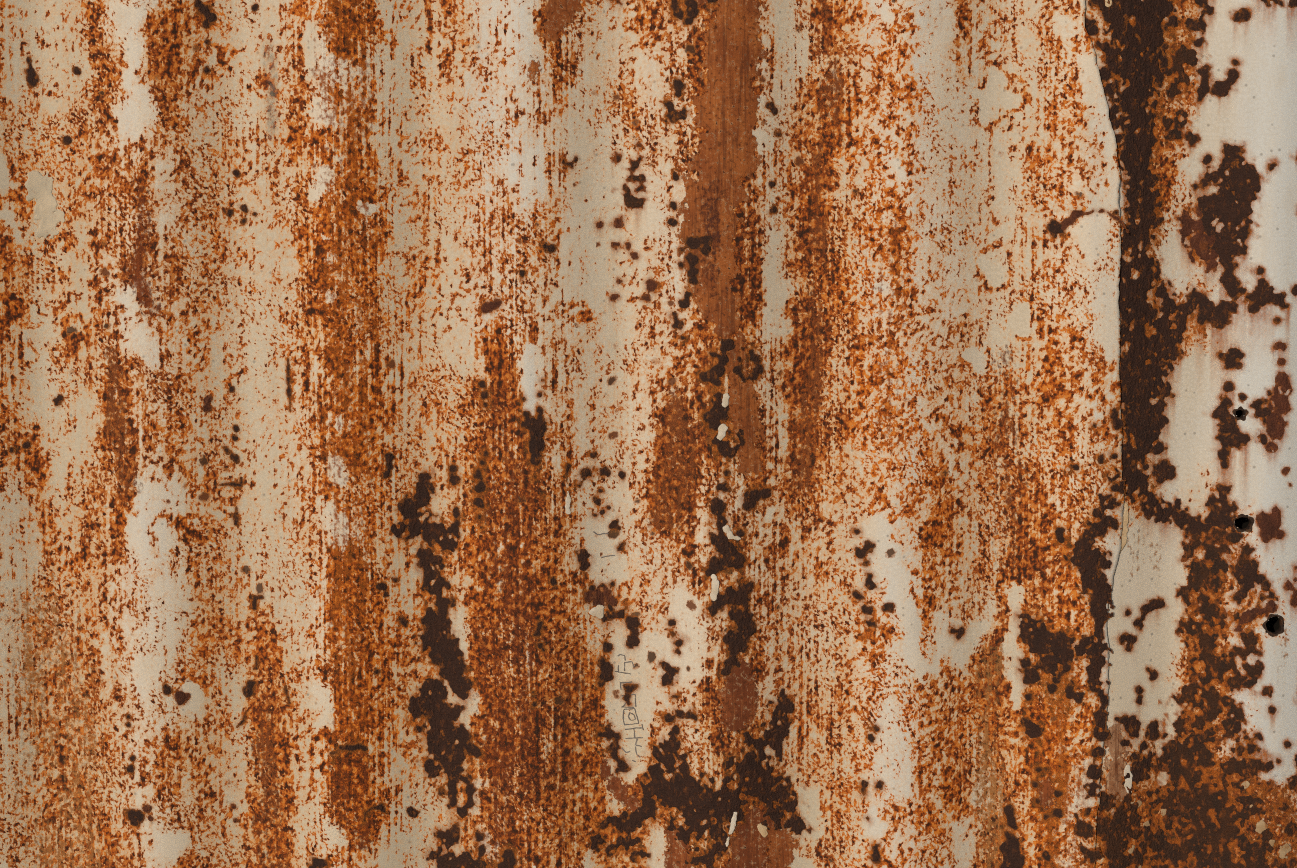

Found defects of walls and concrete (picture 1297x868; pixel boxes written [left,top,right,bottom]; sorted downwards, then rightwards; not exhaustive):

rust [105,347,137,505]
rust [127,178,161,317]
rust [312,0,812,868]
rust [789,0,844,496]
rust [872,223,907,454]
rust [973,0,1297,868]
rust [12,588,110,868]
rust [948,626,965,640]